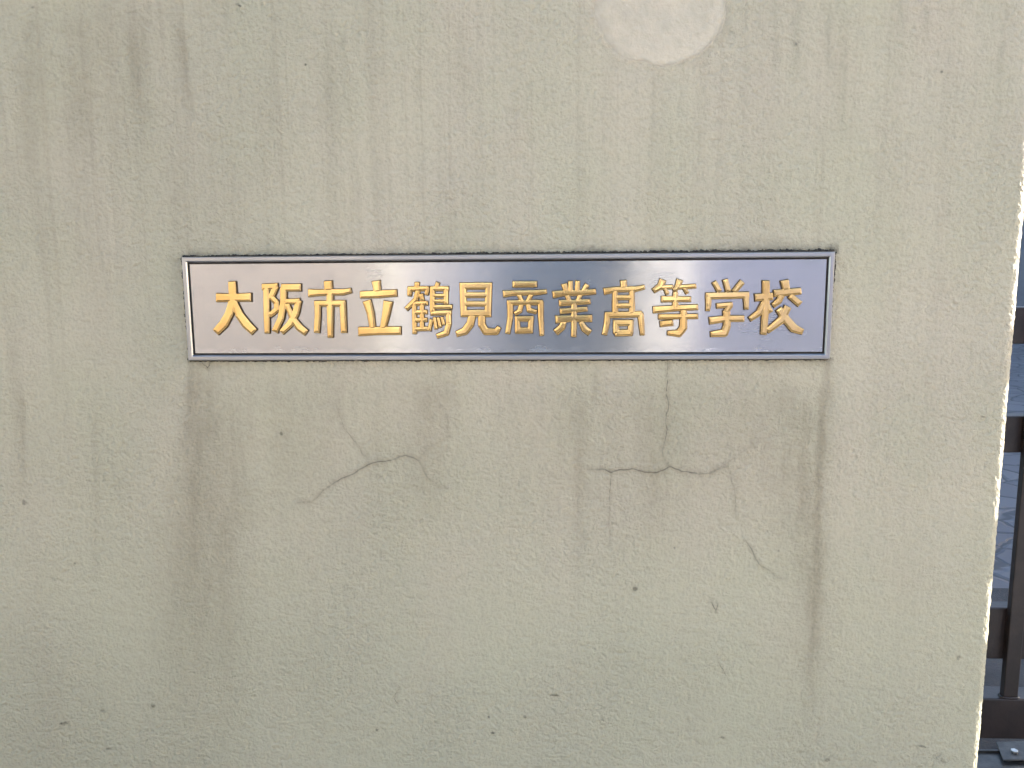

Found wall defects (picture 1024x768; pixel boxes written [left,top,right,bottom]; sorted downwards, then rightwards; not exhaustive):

crack [592,364,757,540]